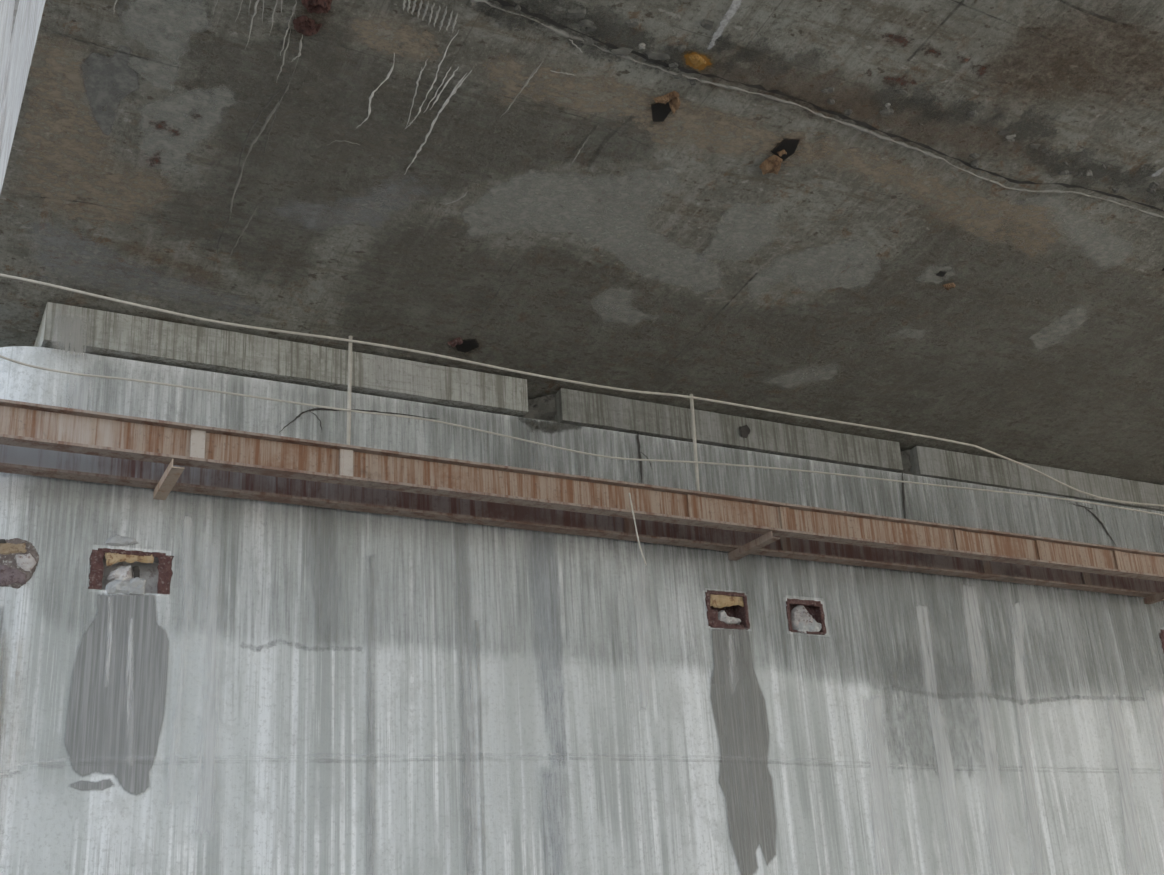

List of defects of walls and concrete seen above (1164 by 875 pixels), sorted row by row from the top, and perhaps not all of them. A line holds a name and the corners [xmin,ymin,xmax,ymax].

leakage [217,0,303,260]
corrosion [293,0,332,37]
leakage [357,53,395,127]
leakage [403,0,472,175]
spalling [651,91,680,122]
corrosion [684,52,716,87]
spalling [759,138,800,175]
crack [492,0,1164,212]
leakage [65,594,175,795]
leakage [711,628,776,875]